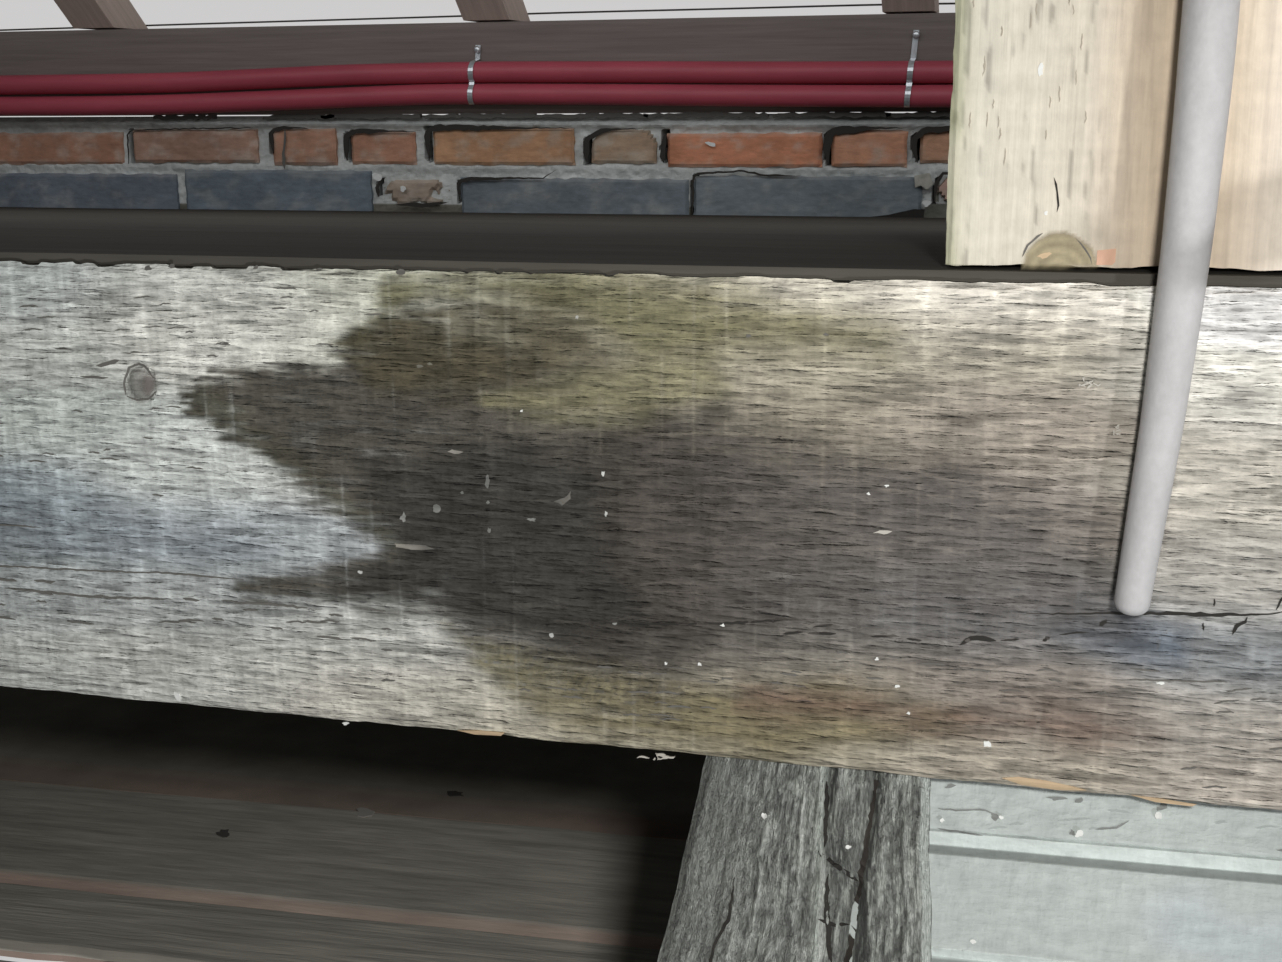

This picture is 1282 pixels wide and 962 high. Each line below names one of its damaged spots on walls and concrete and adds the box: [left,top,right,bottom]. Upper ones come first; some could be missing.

water stain [180,306,1103,668]
crack [818,780,879,962]
peeling [938,808,1004,836]
peeling [1069,821,1128,837]